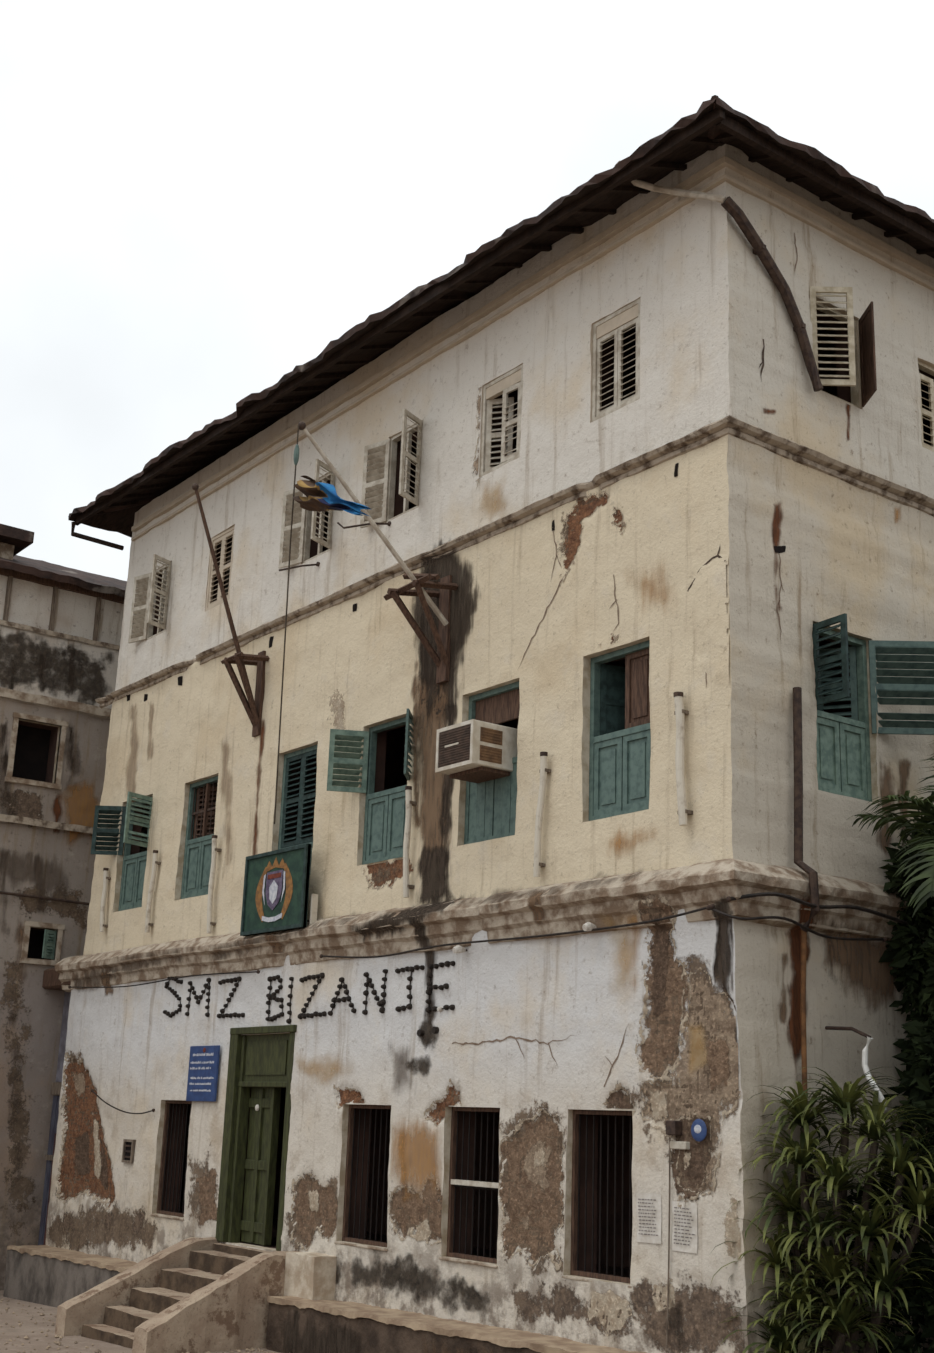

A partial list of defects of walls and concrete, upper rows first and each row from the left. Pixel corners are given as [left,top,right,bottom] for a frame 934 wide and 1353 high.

flaking render [552,489,625,583]
corrosion [772,505,782,571]
water stain [0,632,112,705]
water stain [343,541,477,1082]
water stain [216,925,317,958]
flaking render [603,894,741,1208]
flaking render [55,1051,115,1210]
flaking render [286,1173,338,1251]
flaking render [388,1178,443,1246]
flaking render [498,1100,567,1276]